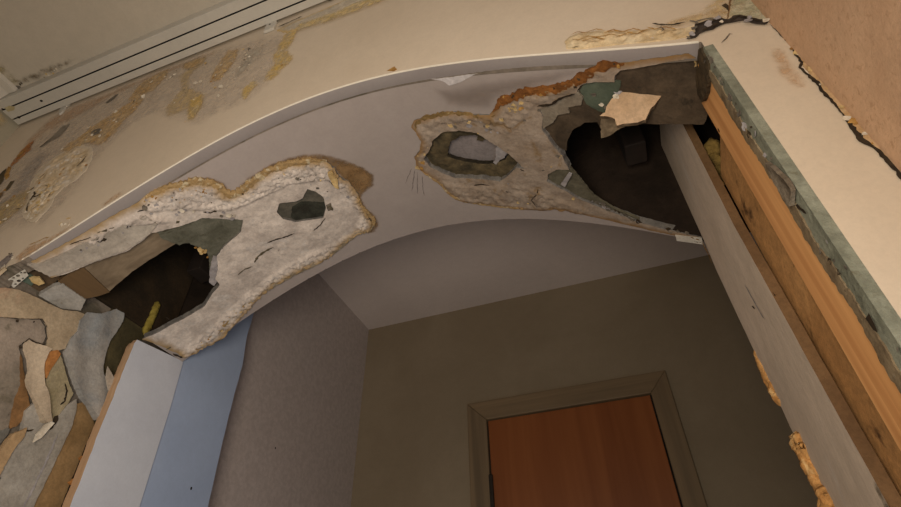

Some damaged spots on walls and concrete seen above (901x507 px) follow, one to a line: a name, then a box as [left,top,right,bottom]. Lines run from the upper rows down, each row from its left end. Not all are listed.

peeling [411,53,701,240]
flaking render [730,0,766,19]
crack [686,0,901,179]
spalling [0,253,14,276]
peeling [27,157,376,358]
peeling [0,309,124,474]